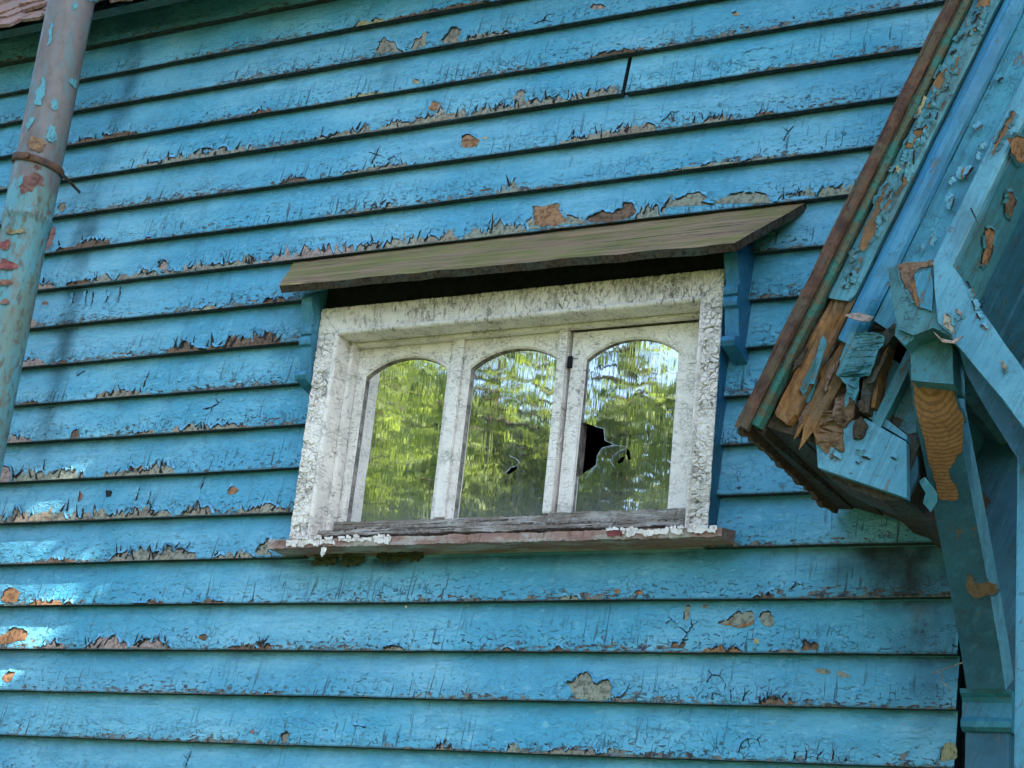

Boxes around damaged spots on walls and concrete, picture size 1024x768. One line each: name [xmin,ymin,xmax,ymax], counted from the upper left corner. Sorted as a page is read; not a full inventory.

peeling [312,84,617,140]
corrosion [18,172,45,194]
peeling [841,0,994,287]
peeling [945,109,1024,209]
corrosion [0,227,27,285]
peeling [30,180,856,327]
peeling [166,326,284,353]
peeling [912,383,967,512]
peeling [0,459,214,523]
peeling [109,542,197,561]
peeling [84,632,173,649]
crack [665,617,699,646]